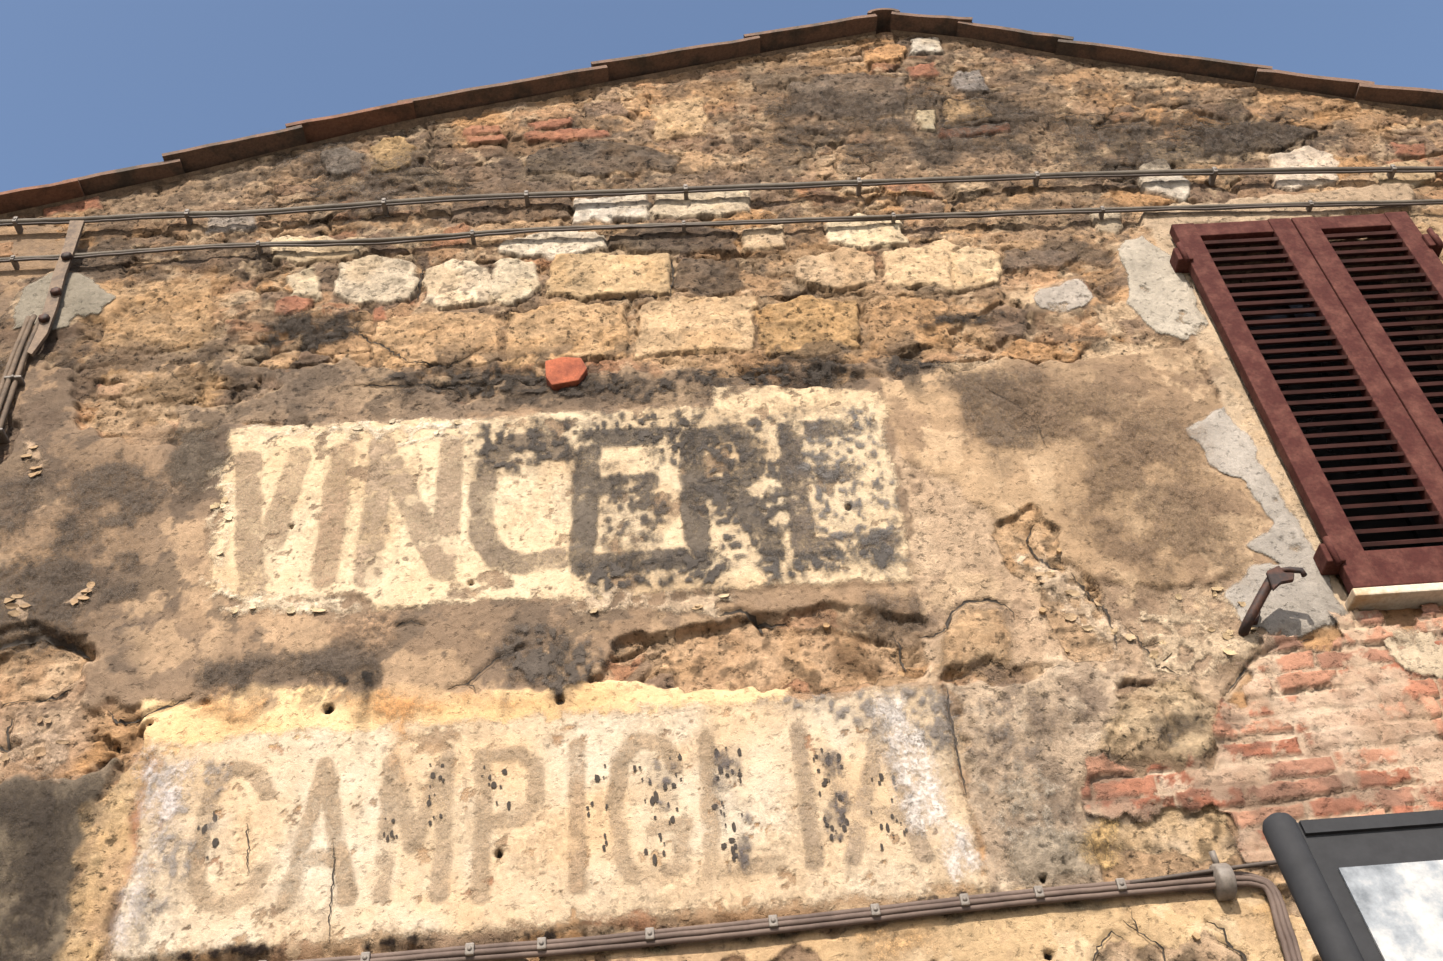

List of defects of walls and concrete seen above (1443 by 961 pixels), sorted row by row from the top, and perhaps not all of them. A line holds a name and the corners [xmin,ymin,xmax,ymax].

peeling [4,594,32,625]
spalling [0,640,96,782]
leakage [0,425,231,655]
leakage [196,639,381,700]
spalling [573,586,904,694]
leakage [346,355,1237,593]
crack [1026,524,1179,675]
spalling [990,503,1443,865]
leakage [145,760,186,819]
leakage [0,773,97,961]
mould [142,942,283,961]
spalling [1266,884,1302,917]